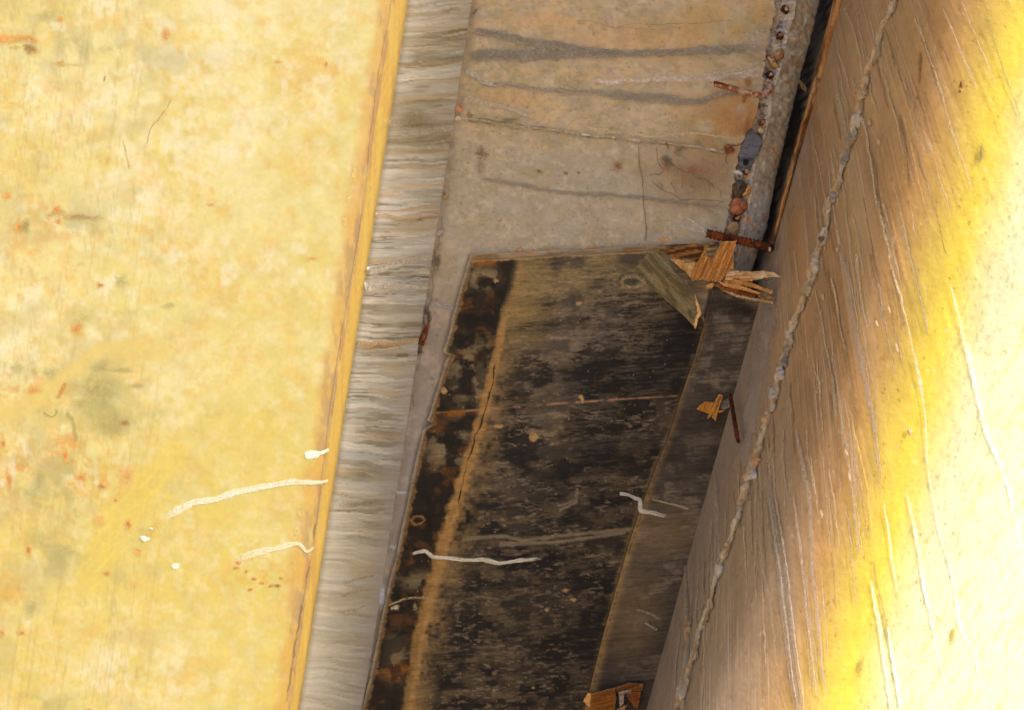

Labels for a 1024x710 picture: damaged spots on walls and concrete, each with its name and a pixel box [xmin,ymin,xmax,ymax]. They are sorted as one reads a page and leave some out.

leakage [466,26,770,105]
rust [723,141,744,164]
spalling [706,0,796,308]
crack [458,365,495,502]